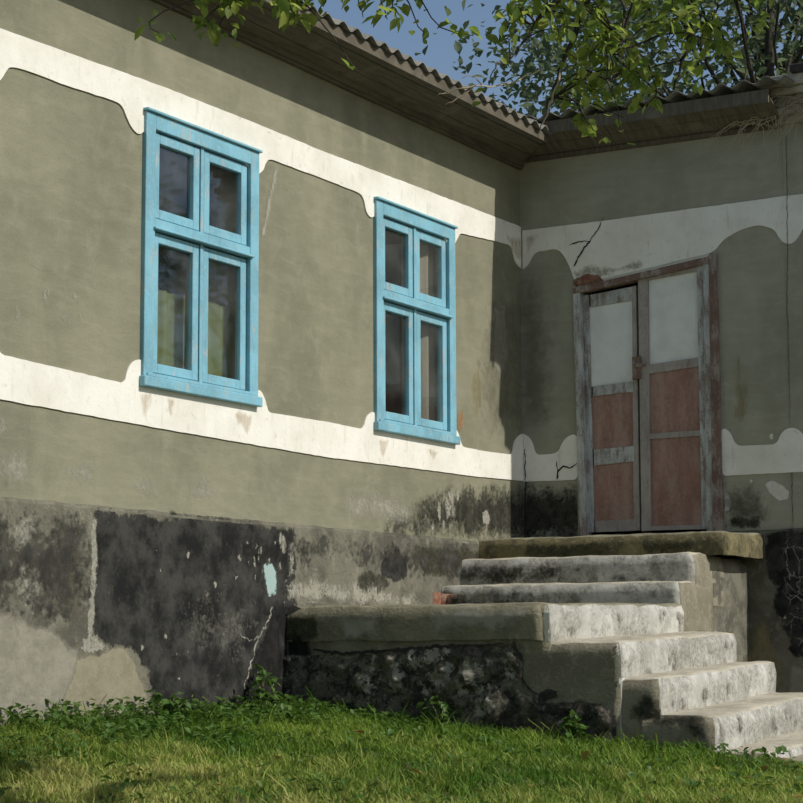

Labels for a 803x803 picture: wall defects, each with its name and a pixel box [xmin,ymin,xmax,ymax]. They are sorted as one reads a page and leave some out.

crack [521,450,529,538]
crack [556,462,577,479]
peeling [765,481,789,501]
damp [0,485,610,715]
crack [241,607,273,693]